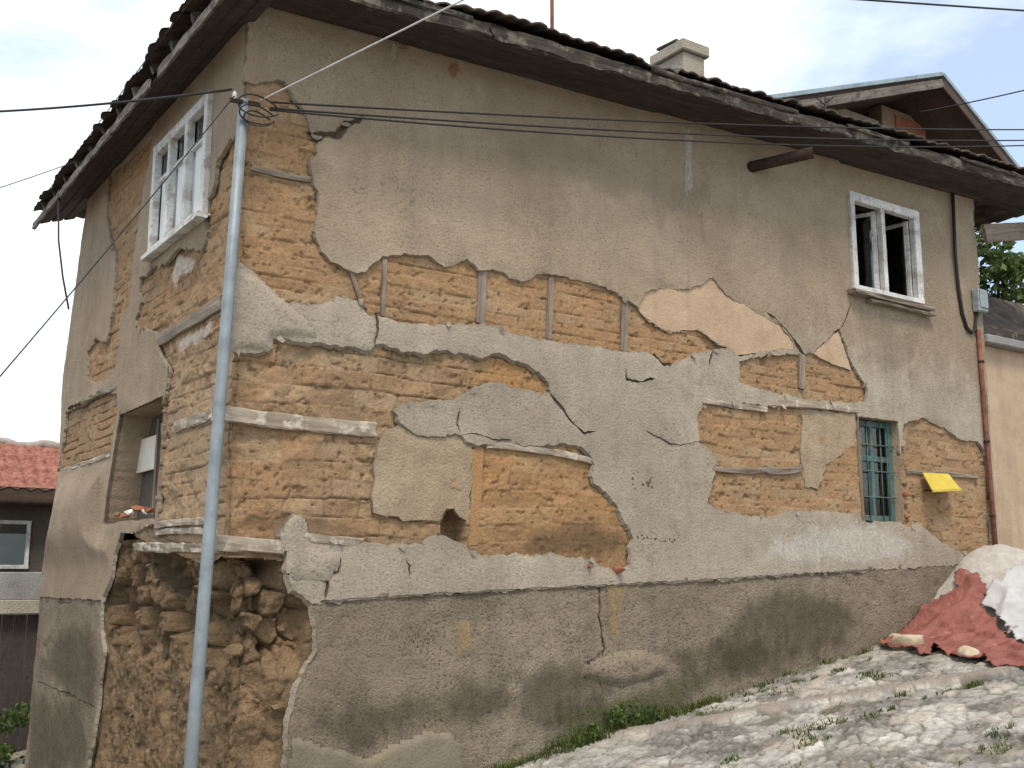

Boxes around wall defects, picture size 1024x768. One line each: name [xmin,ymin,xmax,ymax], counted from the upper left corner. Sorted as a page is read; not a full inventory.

crack [767,312,805,355]
peeling [57,79,872,768]
crack [551,394,594,434]
peeling [900,417,992,556]
crack [321,559,875,687]